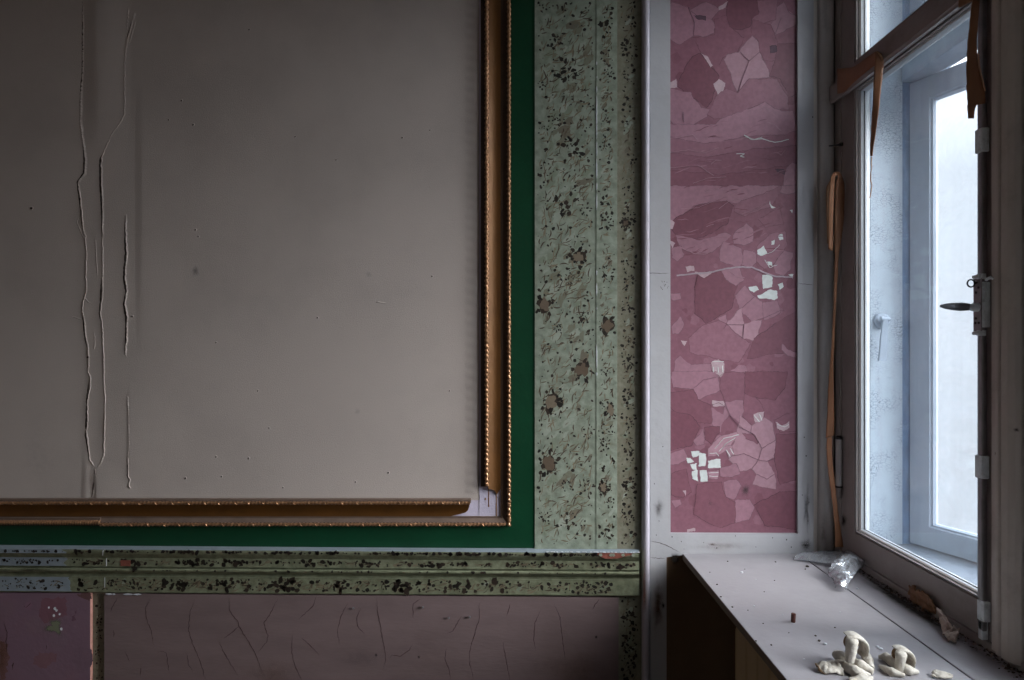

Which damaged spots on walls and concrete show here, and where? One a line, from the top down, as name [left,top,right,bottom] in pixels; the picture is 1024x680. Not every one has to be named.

crack [70,1,136,496]
crack [145,598,319,679]